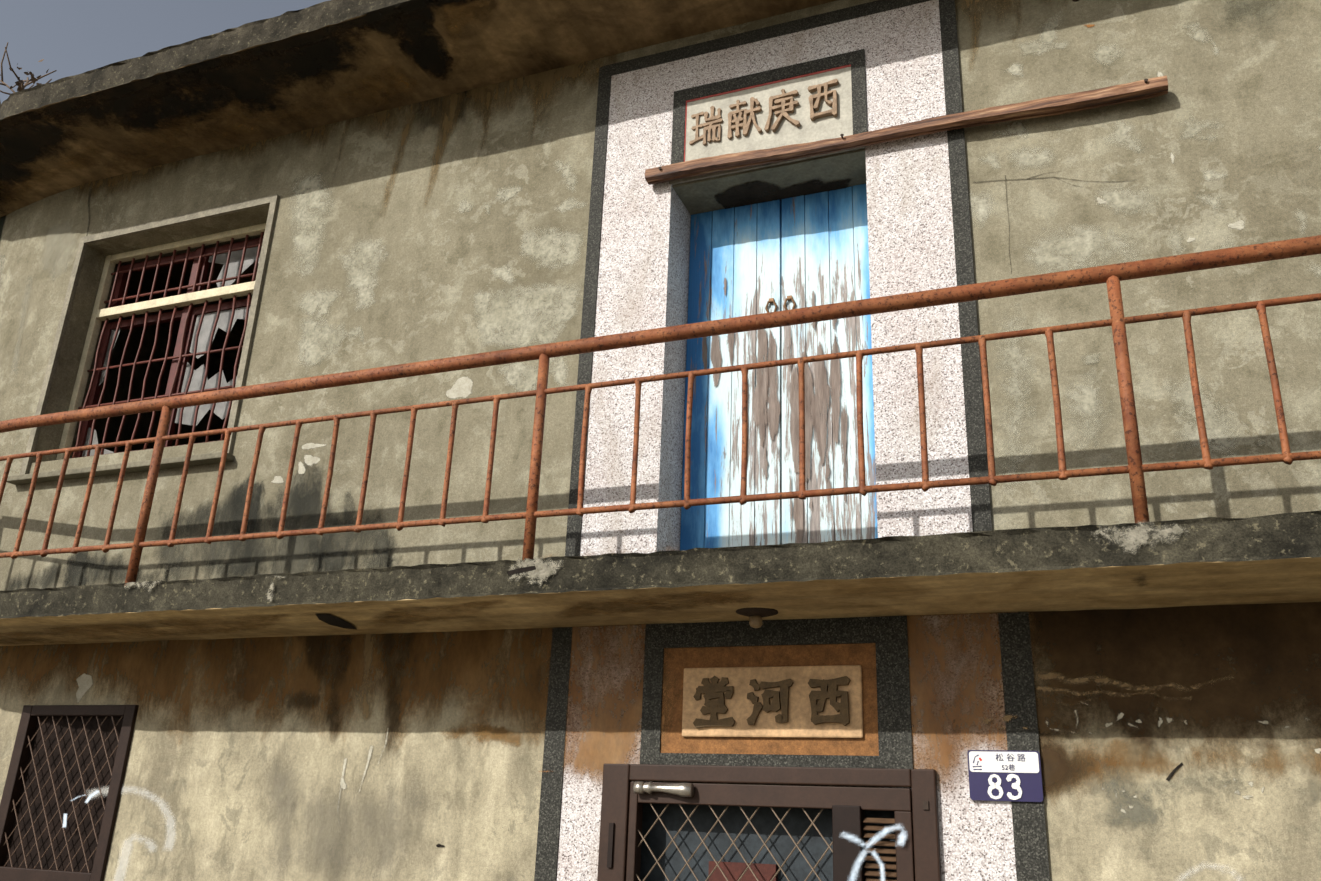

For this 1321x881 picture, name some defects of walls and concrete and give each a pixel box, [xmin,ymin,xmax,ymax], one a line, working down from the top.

damp [0,0,615,239]
damp [8,470,392,590]
spalling [507,557,561,584]
spalling [1095,522,1183,553]
damp [0,593,749,867]
damp [907,602,1321,826]